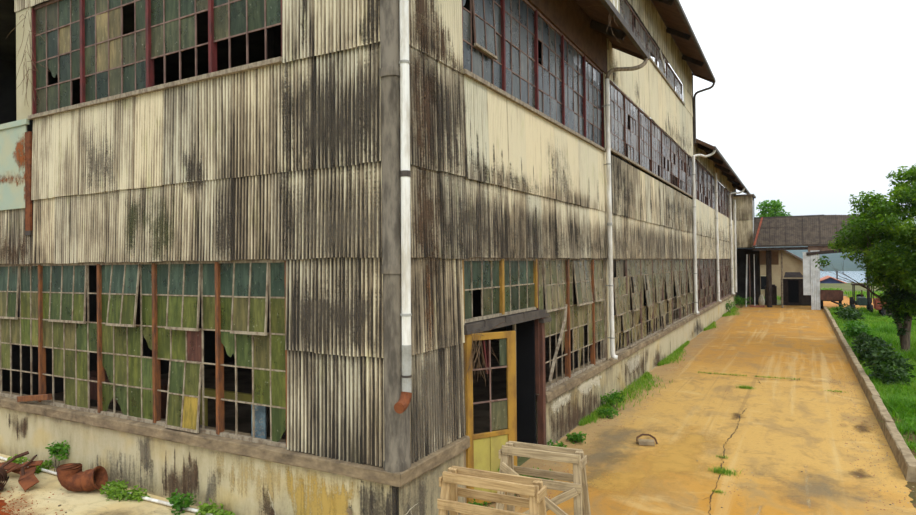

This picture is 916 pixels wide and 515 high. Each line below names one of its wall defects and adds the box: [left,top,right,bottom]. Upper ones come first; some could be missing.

damp [88,129,118,199]
damp [183,148,205,192]
damp [410,0,461,277]
damp [470,123,575,206]
damp [213,191,238,263]
damp [108,438,395,515]
damp [407,483,427,515]
crack [698,409,746,515]